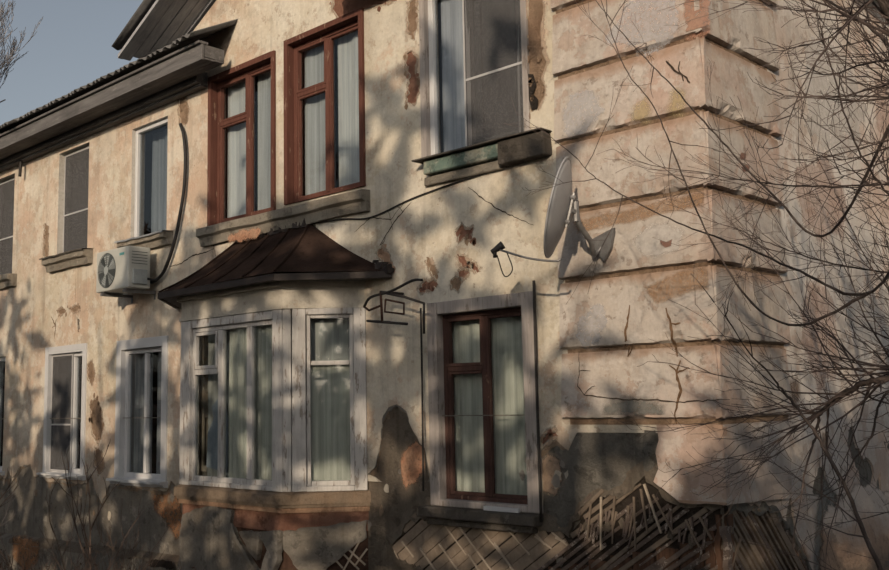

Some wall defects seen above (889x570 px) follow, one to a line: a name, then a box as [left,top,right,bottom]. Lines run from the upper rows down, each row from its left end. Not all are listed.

flaking render [329,0,418,40]
flaking render [403,51,420,110]
flaking render [526,0,550,119]
flaking render [417,257,439,294]
flaking render [450,224,482,292]
flaking render [57,304,81,329]
crack [577,305,730,424]
flaking render [0,361,431,570]
flaking render [536,427,812,570]
flaking render [847,428,879,490]